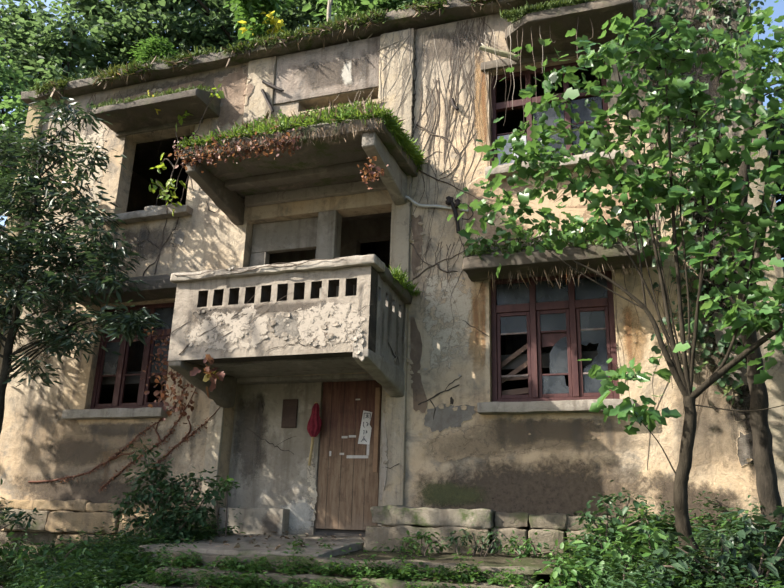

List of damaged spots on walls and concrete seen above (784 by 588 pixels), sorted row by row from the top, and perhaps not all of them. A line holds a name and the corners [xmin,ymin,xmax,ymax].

crack [396,41,472,176]
water stain [646,5,747,373]
spalling [409,214,425,277]
peeling [185,300,369,361]
flaking render [406,269,600,462]
water stain [48,423,152,464]
water stain [496,419,593,444]
water stain [725,383,753,473]
water stain [17,477,202,514]
water stain [416,457,675,525]
water stain [688,483,738,529]